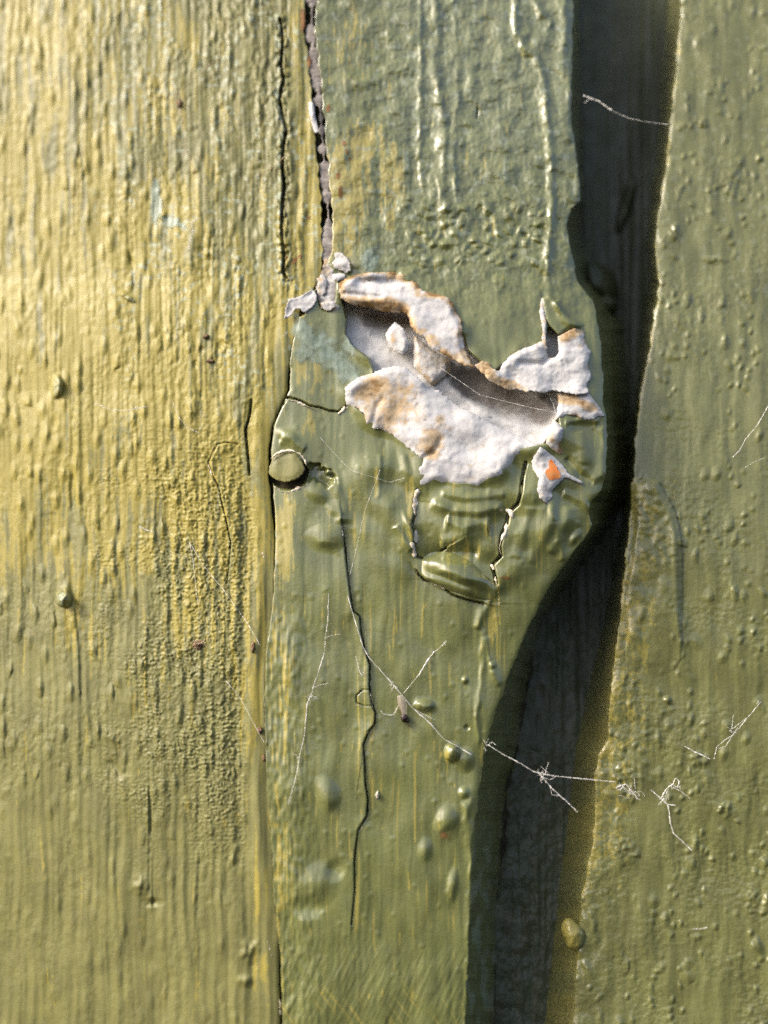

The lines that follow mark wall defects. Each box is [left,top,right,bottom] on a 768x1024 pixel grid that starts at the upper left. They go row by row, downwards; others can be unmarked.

crack [278,0,333,274]
crack [208,371,346,583]
peeling [284,252,605,503]
crack [410,464,526,603]
crack [342,521,376,925]